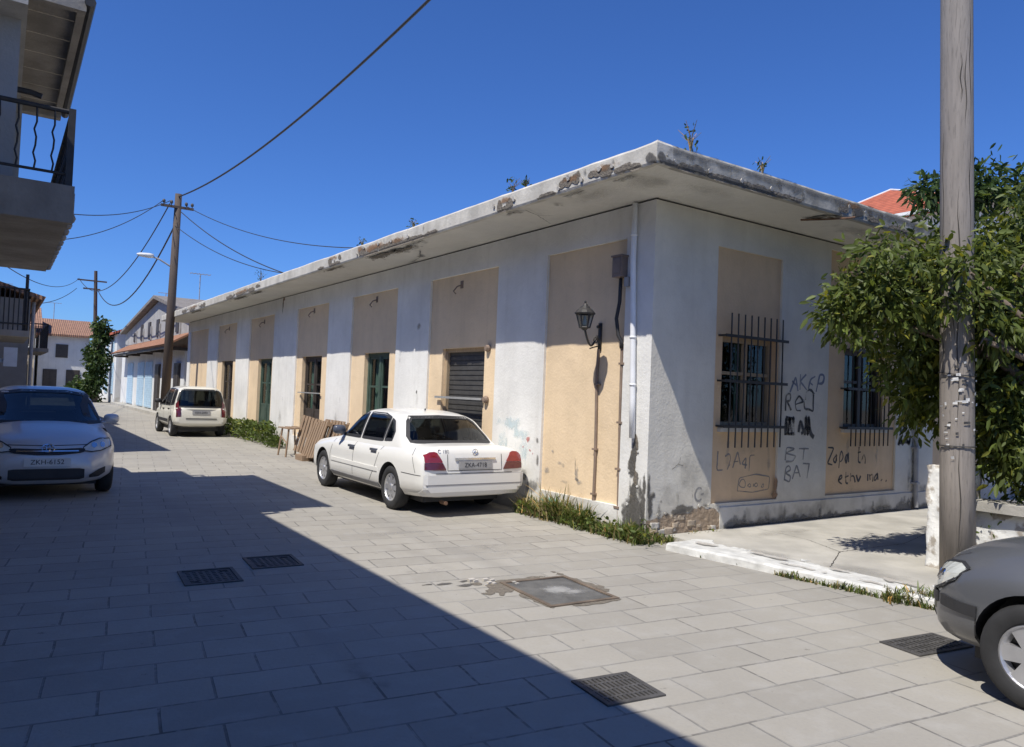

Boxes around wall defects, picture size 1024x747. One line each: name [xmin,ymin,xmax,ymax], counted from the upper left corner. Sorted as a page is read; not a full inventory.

spalling [537,152,803,206]
spalling [492,197,522,214]
damp [747,171,939,236]
spalling [356,227,438,261]
spalling [317,254,341,272]